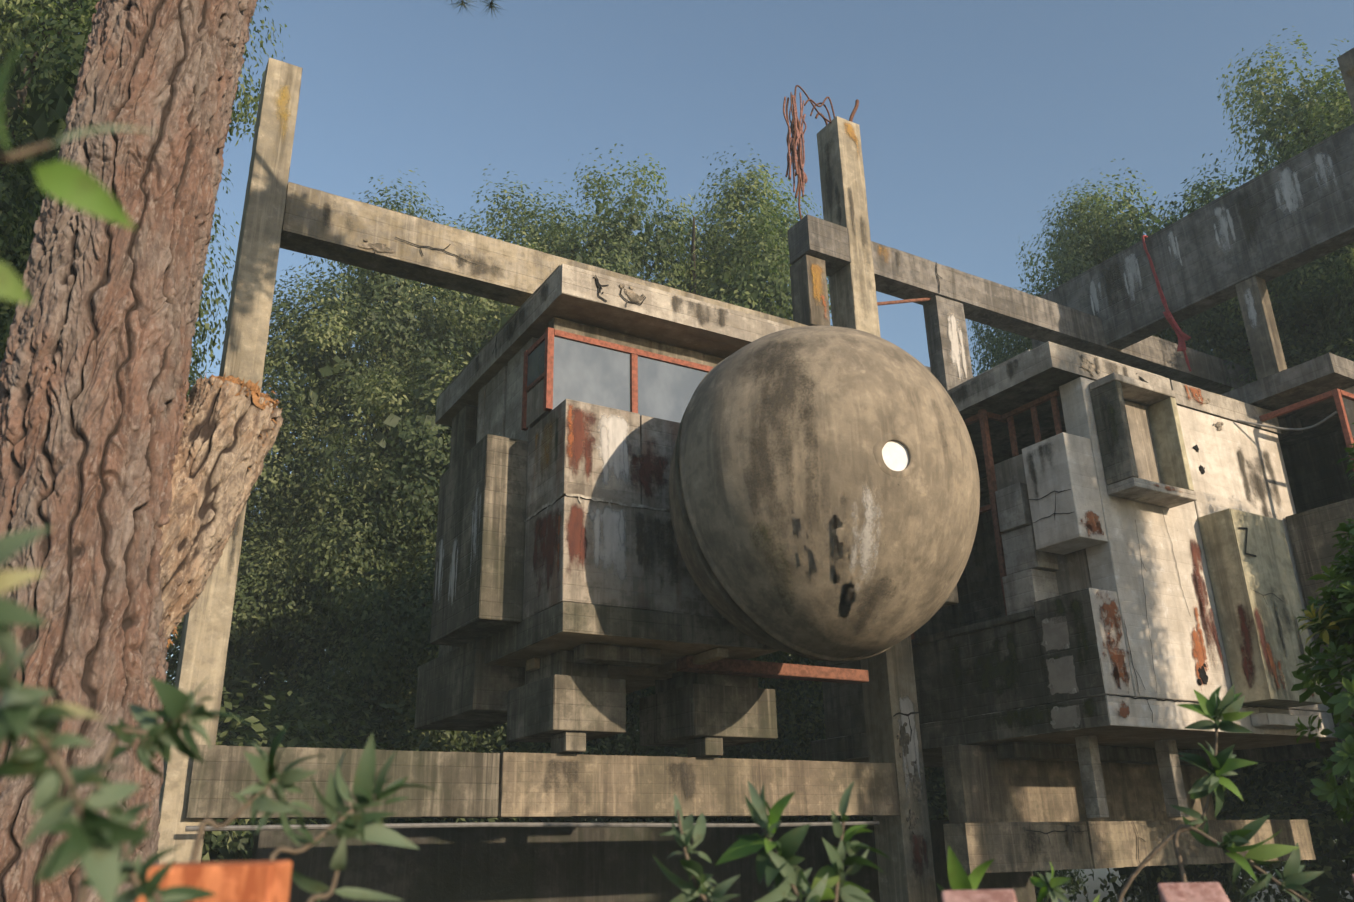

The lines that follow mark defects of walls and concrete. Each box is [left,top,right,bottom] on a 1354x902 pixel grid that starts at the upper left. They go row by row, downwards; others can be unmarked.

rust [783,92,808,220]
water stain [1214,168,1303,252]
water stain [1315,153,1335,185]
water stain [1090,254,1142,315]
water stain [1244,288,1257,326]
rust [567,404,595,477]
rust [533,504,587,597]
water stain [834,493,891,634]
rust [1081,511,1104,536]
rust [1096,591,1130,718]
rust [1191,540,1224,682]
rust [1237,605,1285,689]